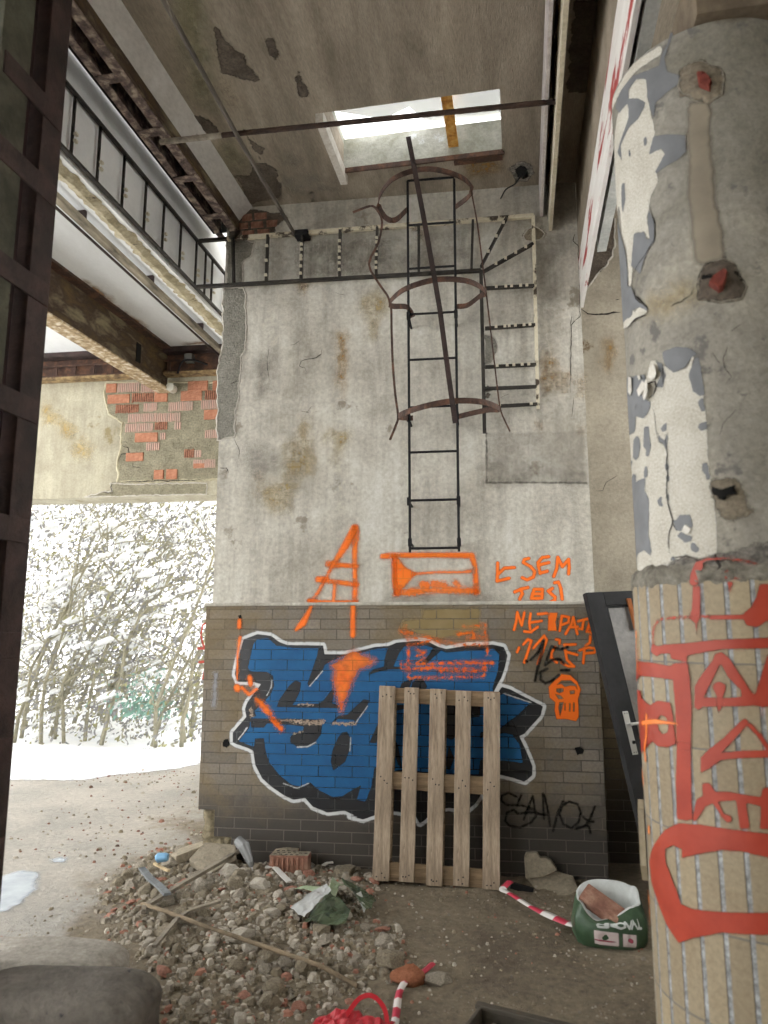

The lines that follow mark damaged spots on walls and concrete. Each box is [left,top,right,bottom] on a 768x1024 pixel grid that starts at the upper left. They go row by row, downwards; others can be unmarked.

spalling [214,27,260,82]
spalling [266,38,279,60]
spalling [295,71,309,97]
spalling [616,32,748,304]
peeling [587,183,655,322]
spalling [58,129,288,498]
peeling [627,347,707,563]
spalling [702,462,754,521]
spalling [665,515,768,567]